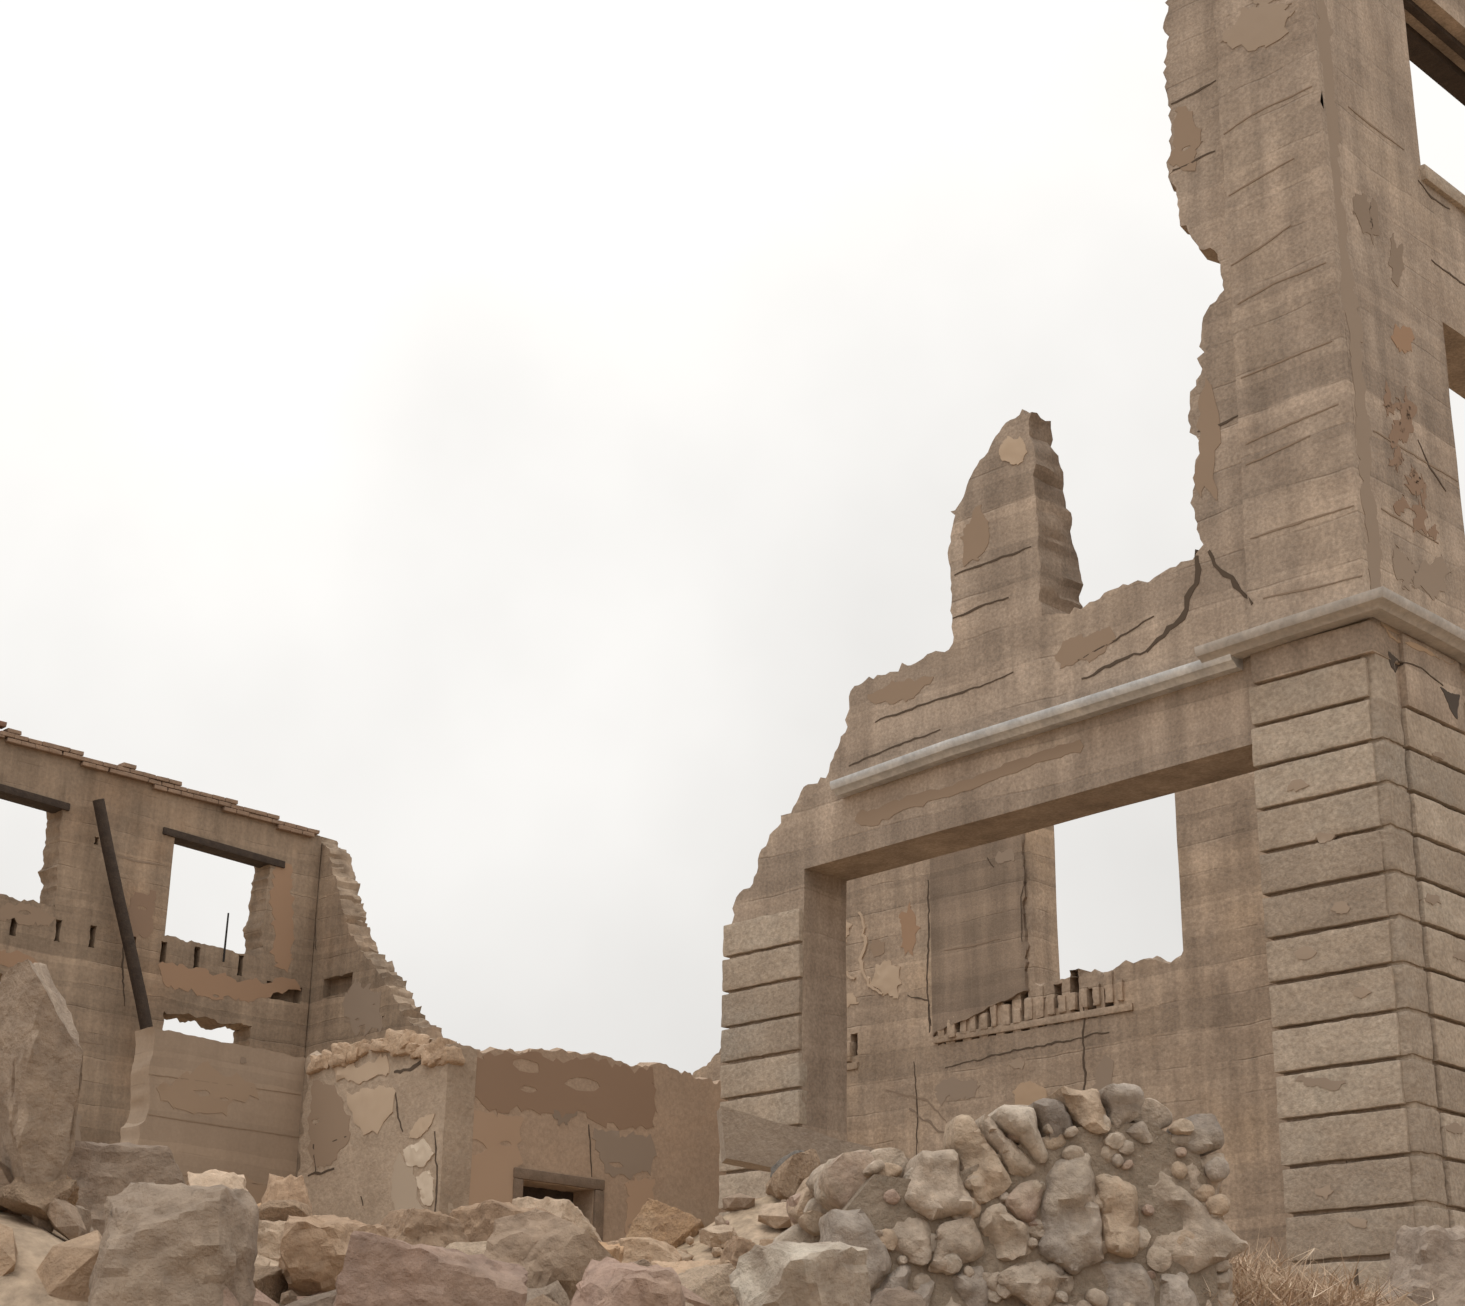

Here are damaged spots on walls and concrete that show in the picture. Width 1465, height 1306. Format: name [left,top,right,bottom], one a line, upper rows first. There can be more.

crack [1078,549,1201,679]
crack [1398,661,1443,686]
spalling [846,911,902,1007]
crack [886,880,1109,1155]
crack [308,1124,346,1176]
crack [394,1060,438,1212]